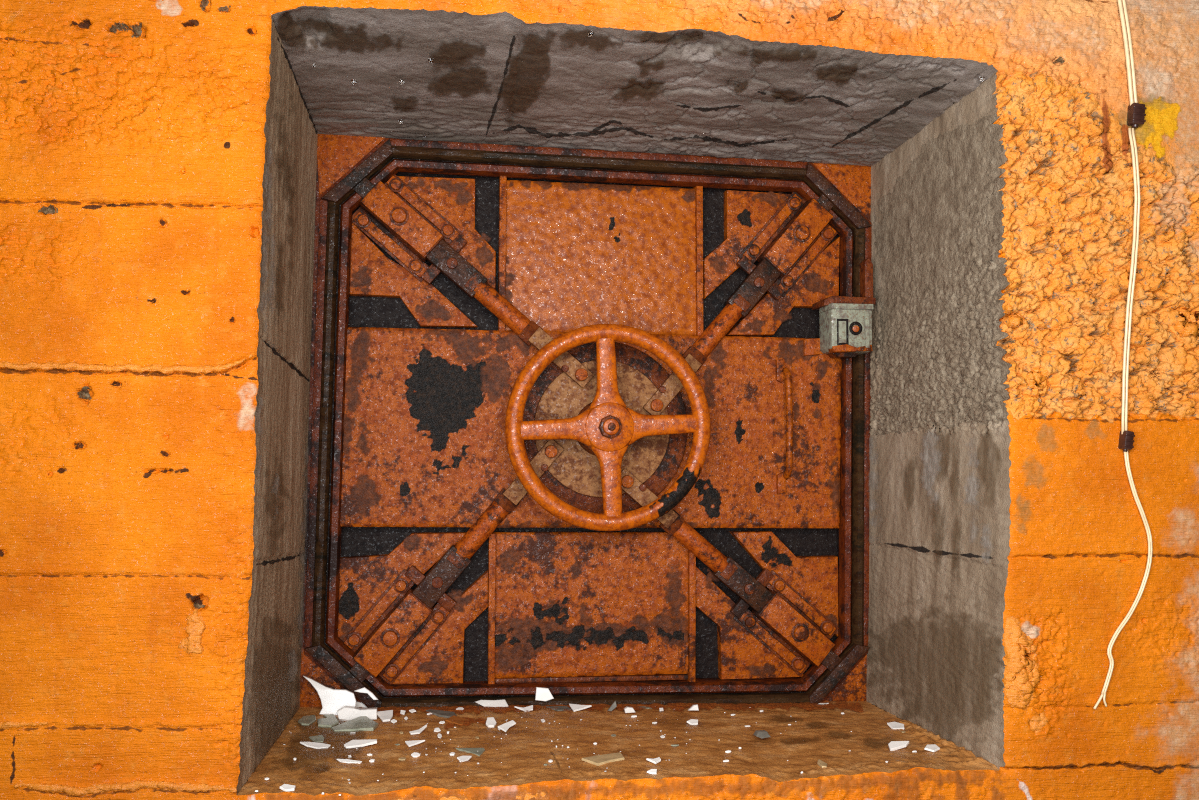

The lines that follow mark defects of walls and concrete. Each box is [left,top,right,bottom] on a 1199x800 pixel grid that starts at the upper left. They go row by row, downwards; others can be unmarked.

crack [0,337,310,382]
rust [342,327,380,515]
rust [389,301,531,475]
rust [735,420,746,444]
rust [763,337,873,449]
rust [635,467,721,528]
rust [761,536,792,568]
crack [885,543,993,559]
rust [339,583,359,640]
rust [495,566,688,672]
water stain [475,785,517,800]
crack [1025,761,1199,774]